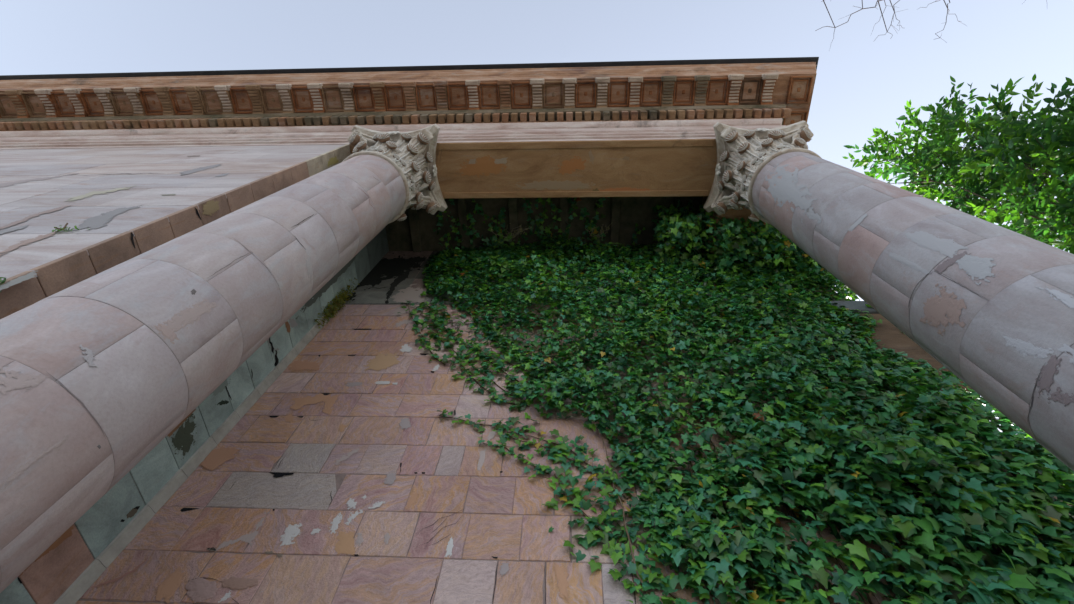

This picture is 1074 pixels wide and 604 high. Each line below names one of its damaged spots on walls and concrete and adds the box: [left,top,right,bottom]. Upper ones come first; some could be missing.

crack [251,338,279,378]
peeling [280,495,385,556]